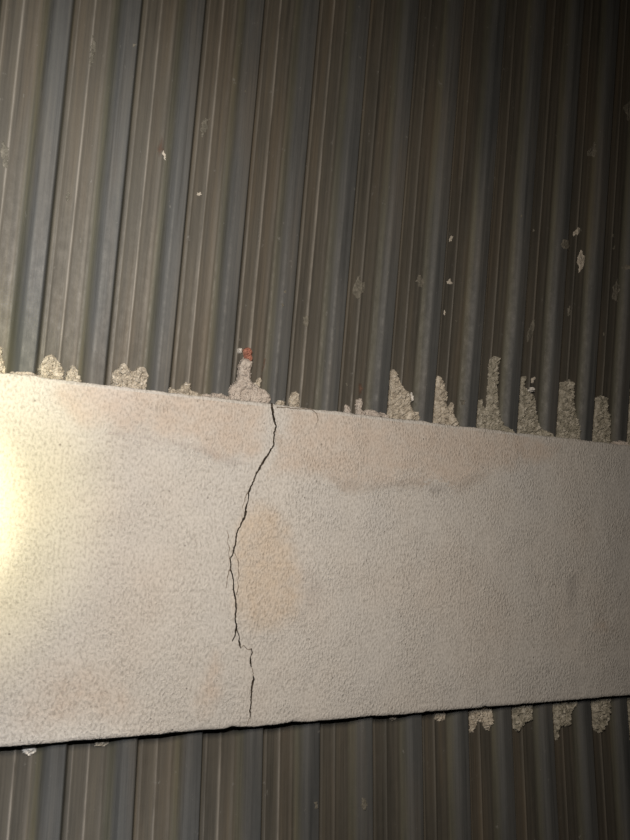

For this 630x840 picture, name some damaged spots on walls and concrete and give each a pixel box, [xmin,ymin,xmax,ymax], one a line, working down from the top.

crack [226,403,318,724]